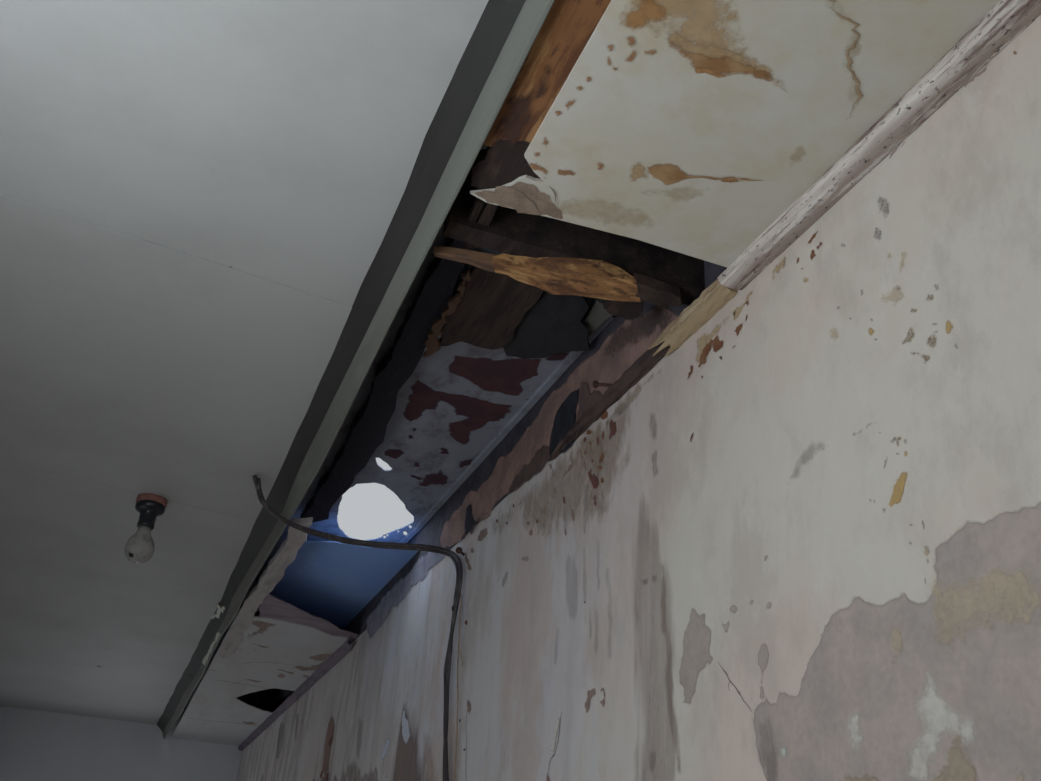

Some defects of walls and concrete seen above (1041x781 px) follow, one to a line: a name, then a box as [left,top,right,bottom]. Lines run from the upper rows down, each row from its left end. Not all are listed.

water stain [625,0,771,80]
water stain [631,164,762,185]
flaking render [704,261,727,289]
flaking render [336,301,689,641]
water stain [465,519,508,570]
flaking render [680,608,713,703]
flaking render [754,503,1041,781]
flaking render [257,688,294,709]
water stain [393,712,432,781]